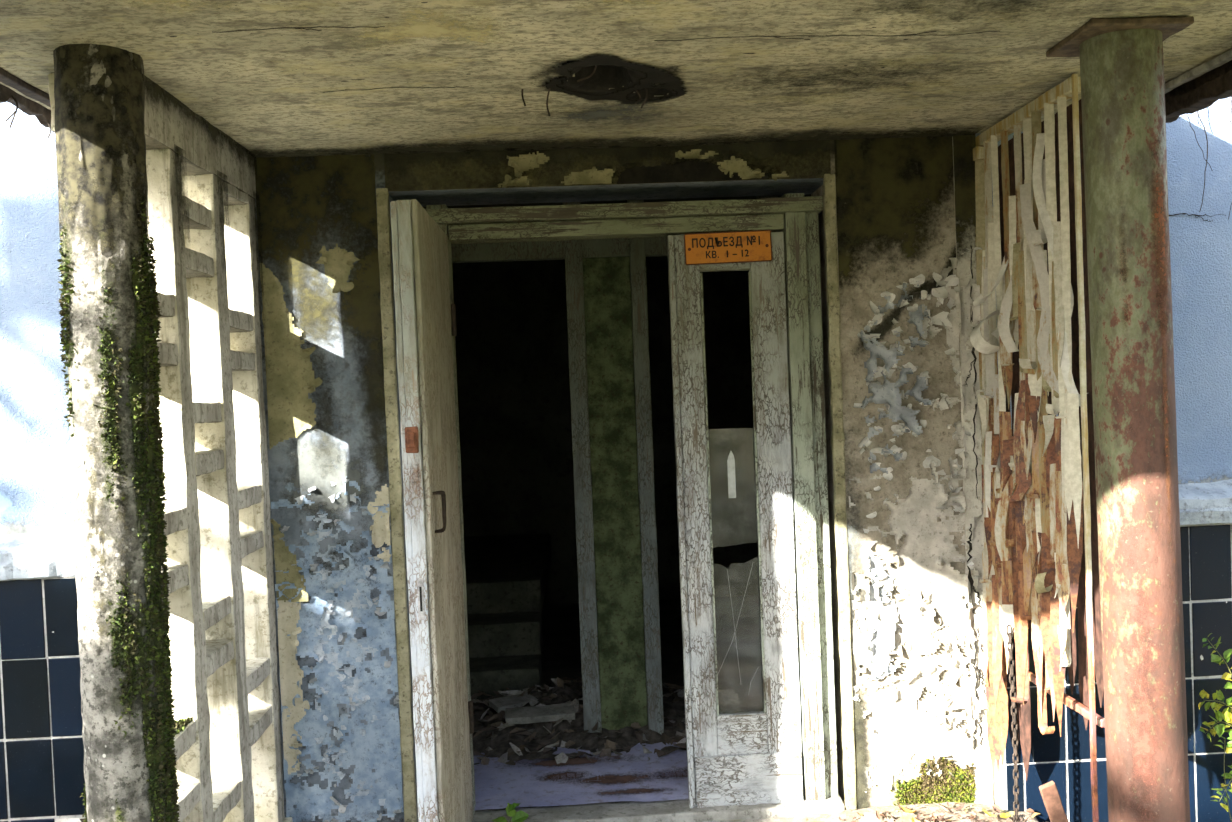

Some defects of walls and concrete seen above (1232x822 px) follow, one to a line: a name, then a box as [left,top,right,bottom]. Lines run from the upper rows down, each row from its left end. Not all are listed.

water stain [82,374,132,664]
peeling [260,263,323,449]
peeling [270,476,404,822]
water stain [53,44,982,529]
peeling [498,151,549,188]
hole [521,55,688,116]
spalling [561,149,789,185]
peeling [849,247,989,790]
crack [966,246,986,752]
corrosion [1125,627,1156,818]
corrosion [1151,140,1170,499]
crack [1169,213,1226,222]